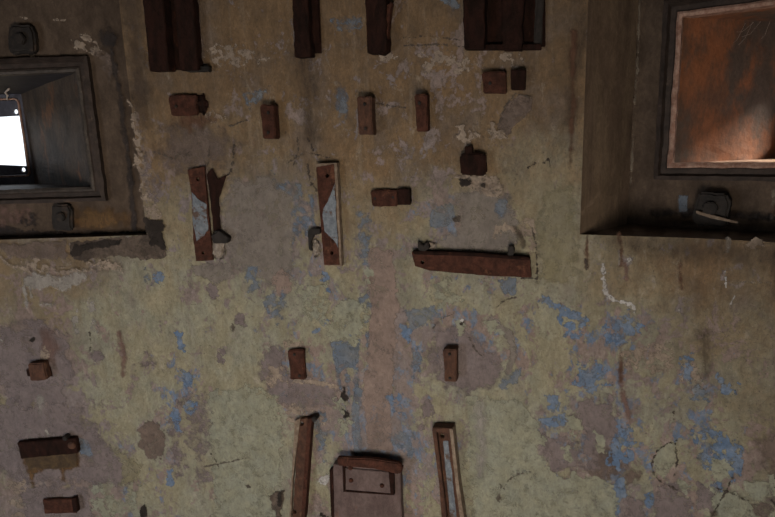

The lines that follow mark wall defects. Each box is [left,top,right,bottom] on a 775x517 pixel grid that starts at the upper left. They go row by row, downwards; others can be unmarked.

peeling [538,295,590,340]
crack [651,440,679,491]
crack [711,477,749,517]